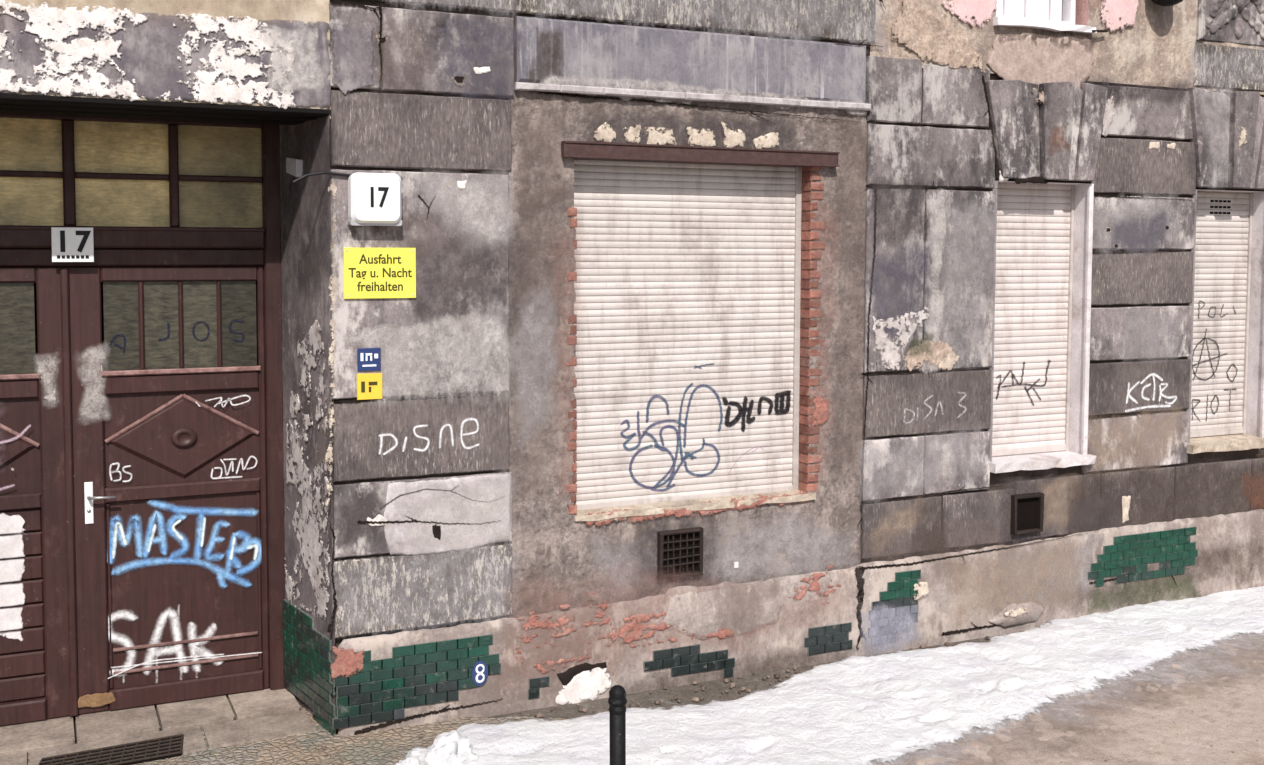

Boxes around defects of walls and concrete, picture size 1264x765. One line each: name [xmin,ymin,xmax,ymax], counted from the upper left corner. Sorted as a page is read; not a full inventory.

peeling [0,0,148,101]
peeling [160,13,297,109]
flaking render [593,121,780,149]
peeling [284,214,338,620]
flaking render [566,166,829,527]
peeling [872,307,959,372]
crack [855,75,1088,649]
flaking render [513,592,734,705]